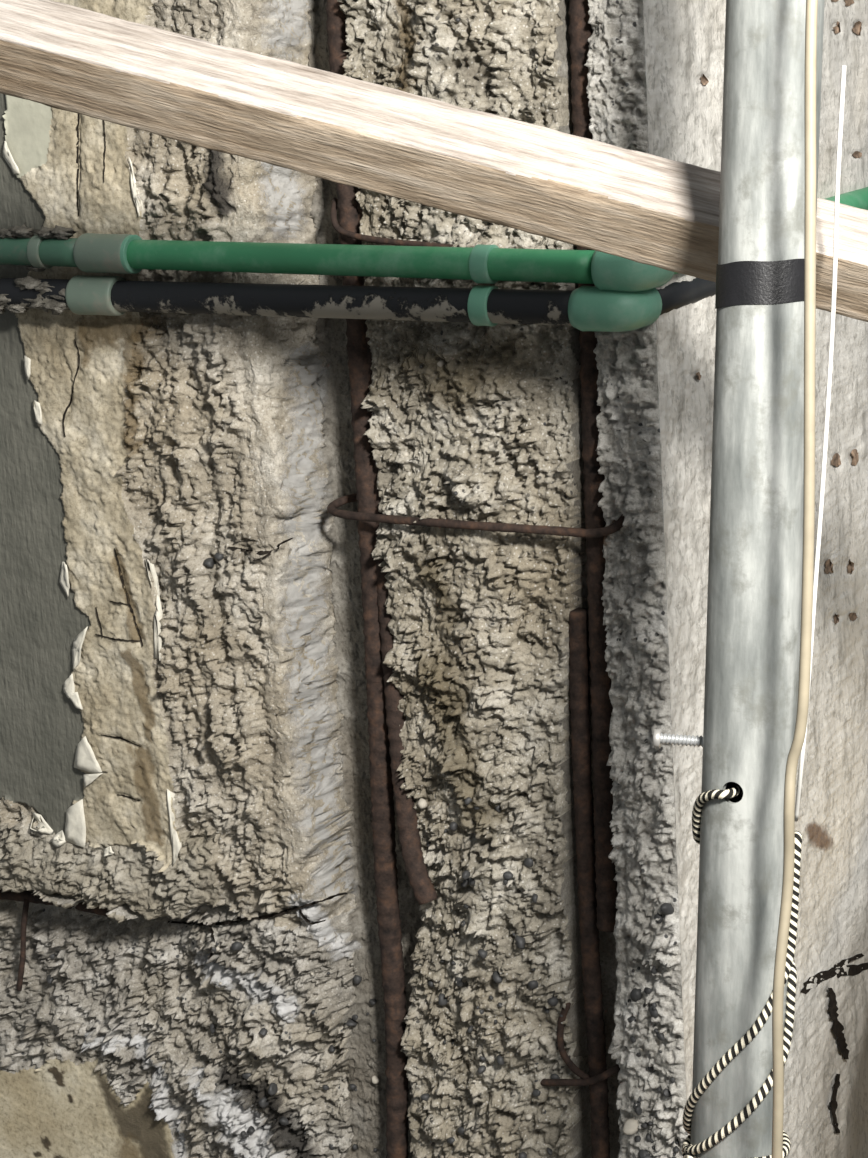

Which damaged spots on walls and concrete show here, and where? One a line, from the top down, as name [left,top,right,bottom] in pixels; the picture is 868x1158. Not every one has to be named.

spalling [52,0,313,66]
rust [397,0,415,90]
spalling [325,0,649,154]
spalling [3,95,318,244]
spalling [336,183,591,250]
spalling [27,266,320,285]
crack [95,548,143,646]
spalling [0,309,688,1158]
crack [167,892,348,958]
water stain [48,1067,73,1103]
water stain [81,1032,186,1158]
water stain [34,1136,62,1158]